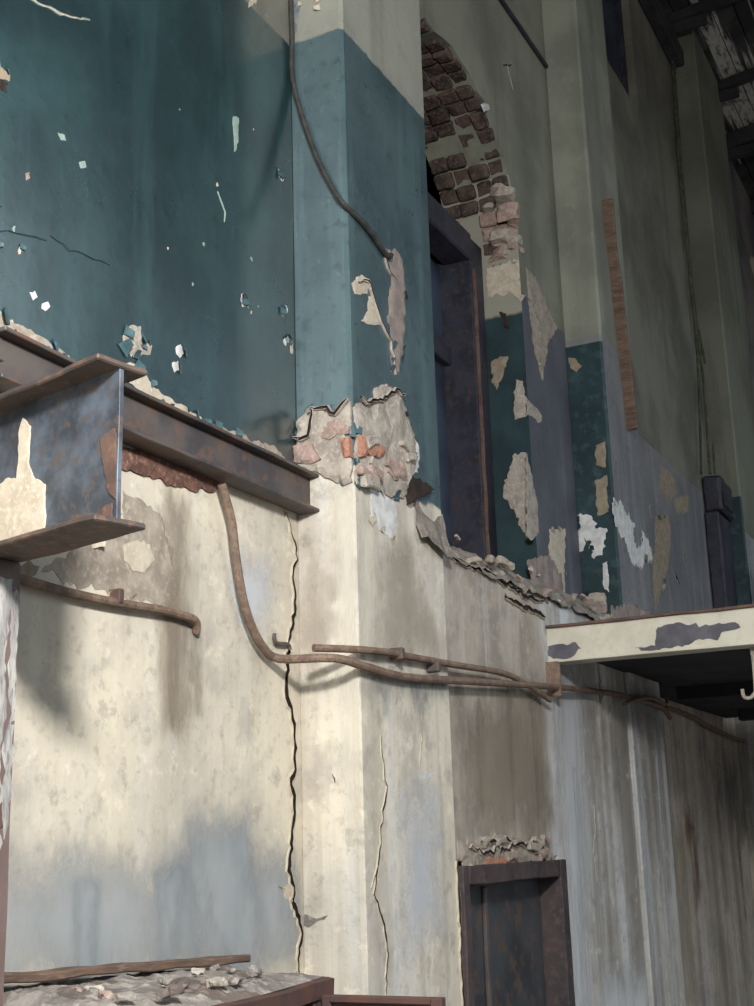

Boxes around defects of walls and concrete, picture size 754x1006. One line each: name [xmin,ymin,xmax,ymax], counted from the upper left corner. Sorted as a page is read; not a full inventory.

crack [0,206,110,265]
flaking render [483,183,557,381]
flaking render [118,248,689,620]
peeling [638,622,741,651]
crack [279,512,328,973]
water stain [4,819,299,980]
crack [371,735,389,996]
flaking render [456,833,555,866]
water stain [655,757,692,1005]